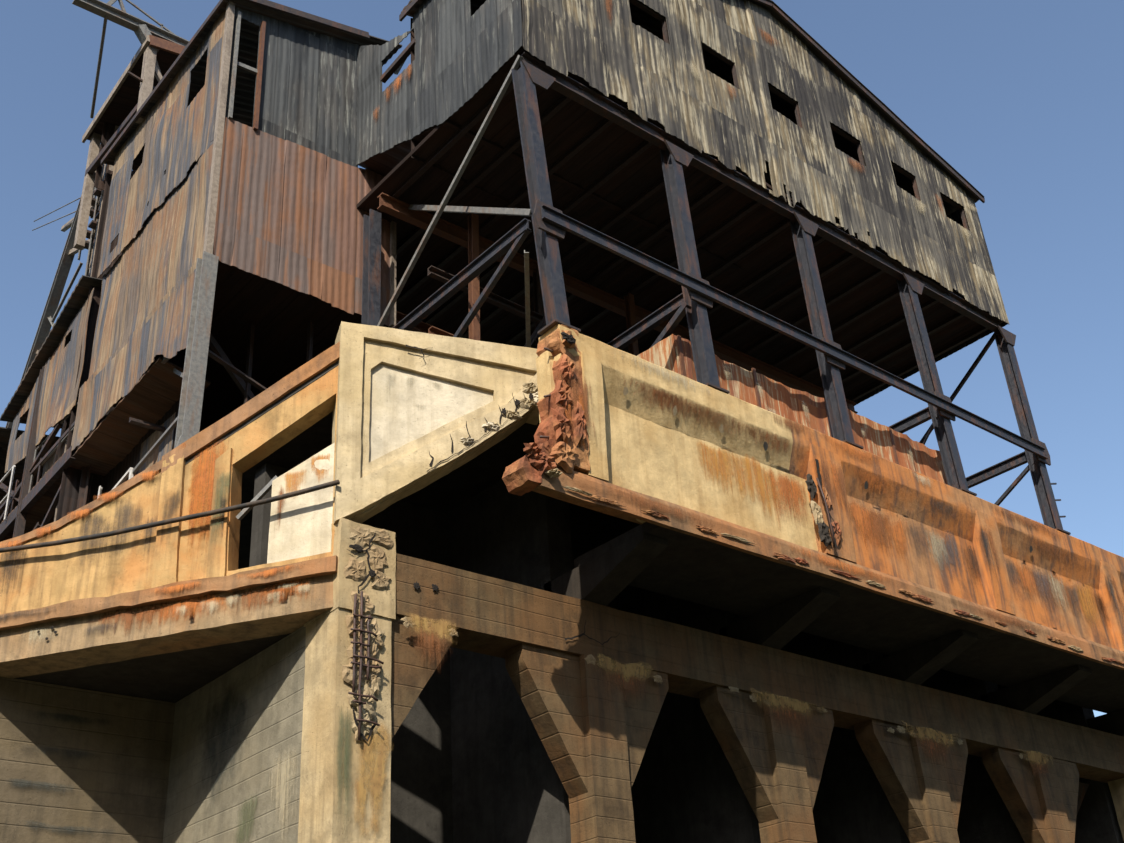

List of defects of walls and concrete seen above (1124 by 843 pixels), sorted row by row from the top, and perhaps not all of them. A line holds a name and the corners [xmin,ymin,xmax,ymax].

crack [427,393,526,472]
spalling [523,330,625,507]
corrosion [751,416,802,453]
corrosion [189,444,223,535]
corrosion [815,442,906,551]
corrosion [1001,509,1069,562]
corrosion [802,549,882,578]
corrosion [1006,563,1108,618]
spalling [342,526,393,742]
peeling [401,614,458,654]
peeling [584,654,663,693]
peeling [729,686,828,730]